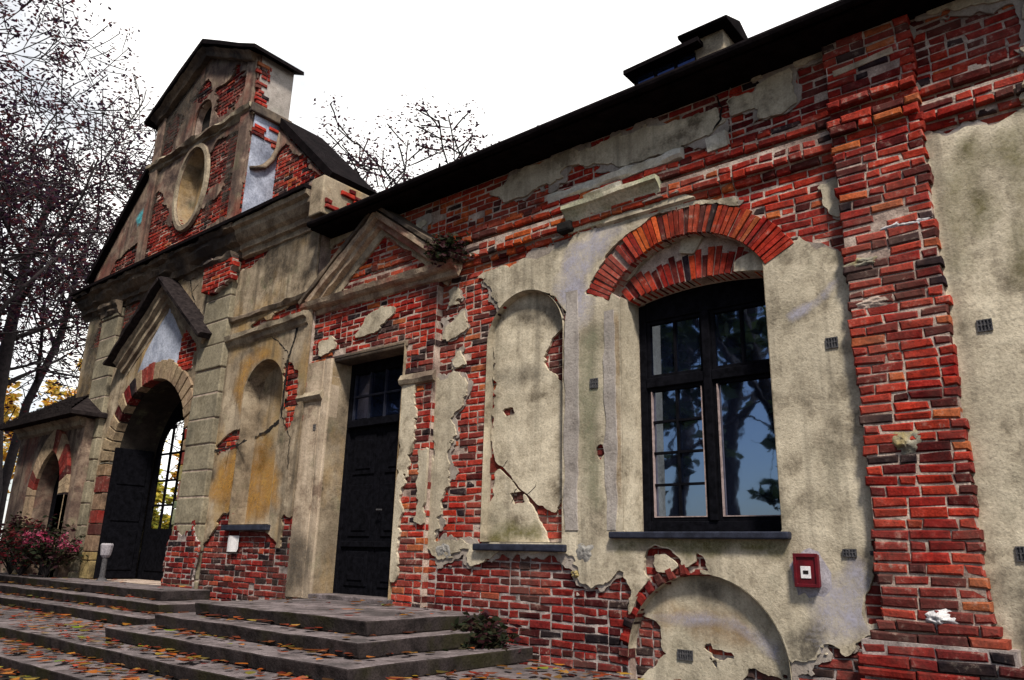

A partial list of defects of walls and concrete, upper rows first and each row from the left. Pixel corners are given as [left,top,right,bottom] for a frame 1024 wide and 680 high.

flaking render [191,57,272,117]
crack [713,96,730,130]
flaking render [111,123,324,274]
flaking render [201,251,268,296]
crack [214,327,298,470]
flaking render [252,62,845,680]
flaking render [217,430,240,454]
crack [490,457,539,509]
flaking render [161,508,294,601]